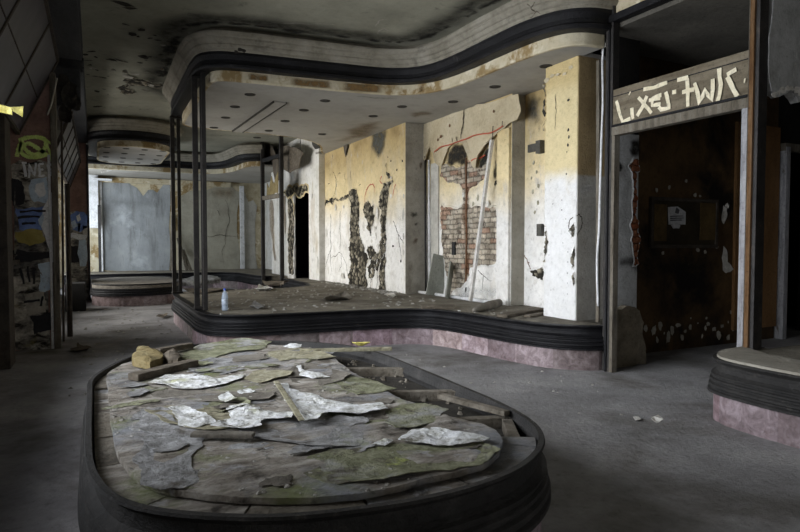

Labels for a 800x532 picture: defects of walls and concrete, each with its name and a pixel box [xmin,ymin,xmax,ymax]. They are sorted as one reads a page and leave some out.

spalling [542,65,573,132]
spalling [284,183,313,276]
spalling [325,157,403,291]
spalling [439,146,497,295]
spalling [530,222,549,285]
spalling [628,157,641,267]